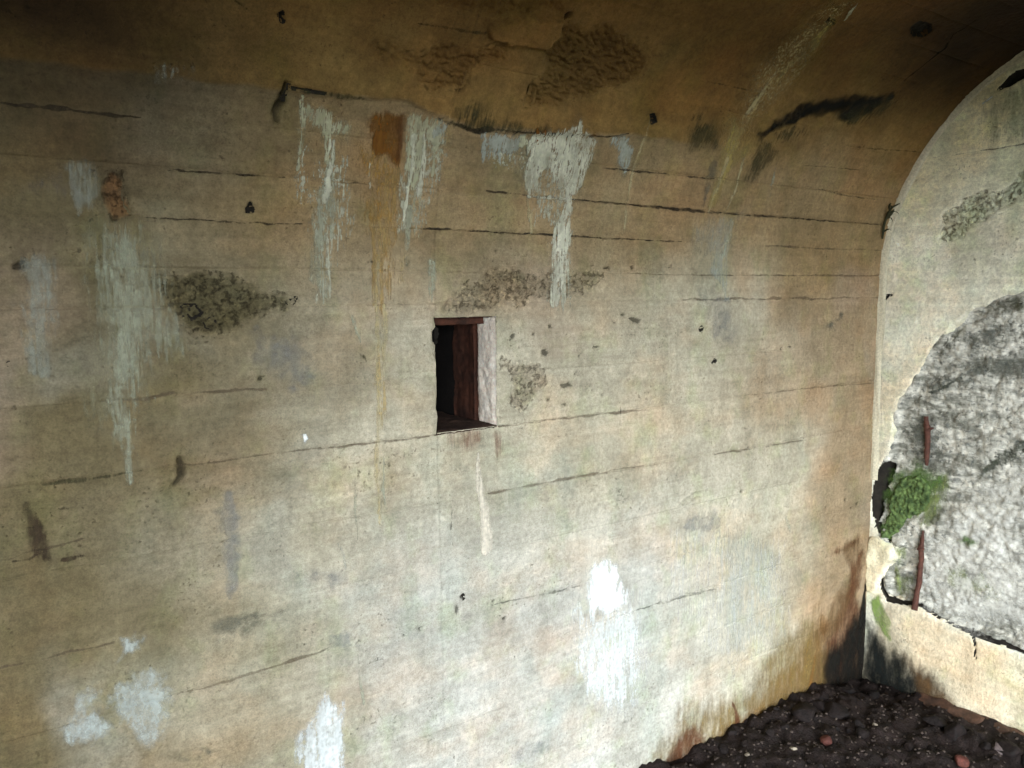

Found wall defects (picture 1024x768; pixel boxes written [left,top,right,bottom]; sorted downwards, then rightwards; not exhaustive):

damp [293,88,354,300]
corrosion [358,111,405,327]
damp [395,114,447,239]
damp [459,103,597,311]
spalling [523,10,648,111]
damp [611,136,641,195]
damp [691,1,896,206]
spalling [874,291,1024,653]
damp [298,698,343,768]
damp [576,560,635,704]
damp [668,584,943,762]